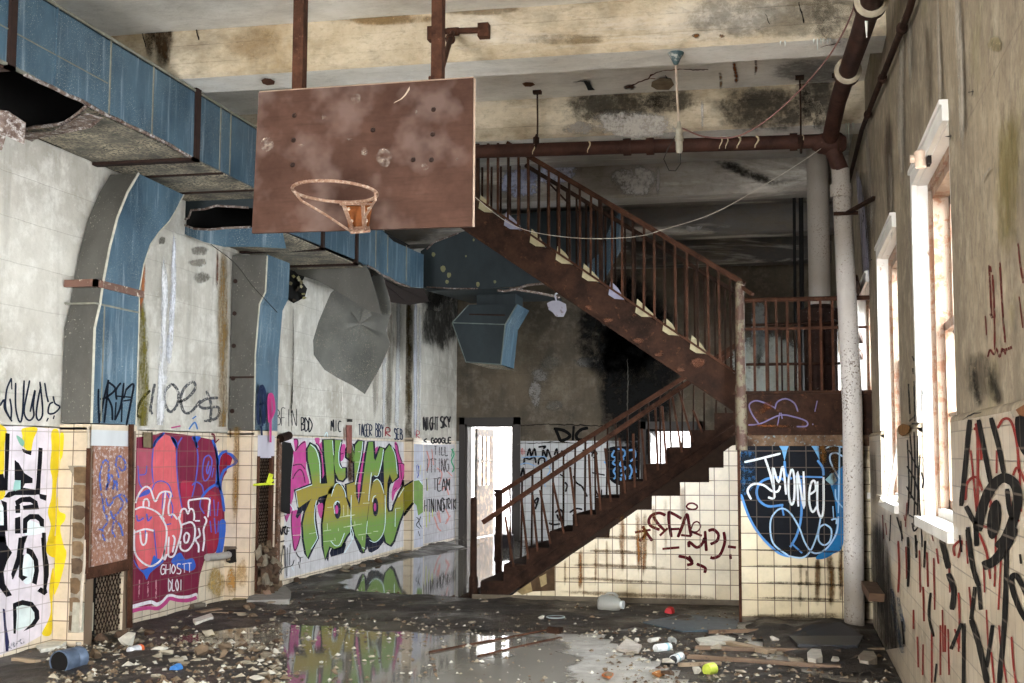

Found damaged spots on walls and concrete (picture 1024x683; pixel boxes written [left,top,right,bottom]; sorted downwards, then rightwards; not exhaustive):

damp [145,31,172,65]
damp [719,82,832,149]
damp [190,247,209,282]
damp [138,237,176,426]
corrosion [217,254,239,512]
corrosion [818,446,837,483]
corrosion [226,569,236,590]
corrosion [800,552,843,603]